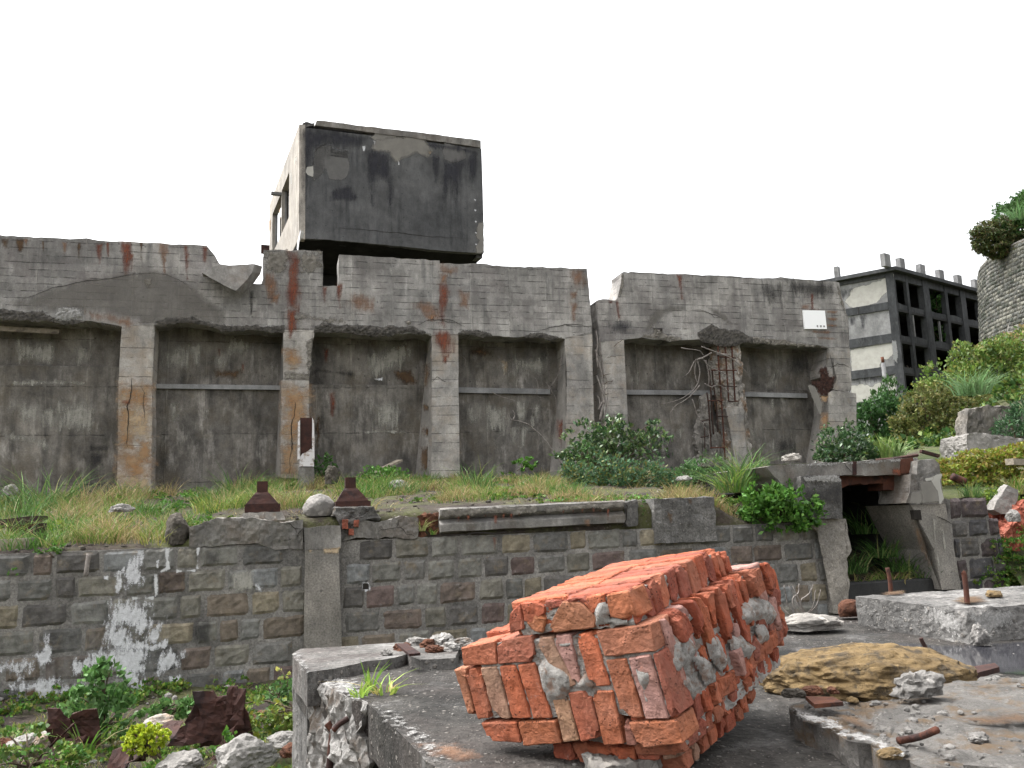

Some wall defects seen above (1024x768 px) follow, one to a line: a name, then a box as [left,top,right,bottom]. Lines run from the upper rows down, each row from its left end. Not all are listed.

damp [290,129,399,203]
damp [427,142,476,194]
rust [97,242,142,270]
peeling [0,273,284,333]
rust [266,254,300,334]
rust [420,270,452,319]
peeling [837,274,894,314]
rust [436,332,451,363]
peeling [850,340,898,371]
crack [126,380,145,447]
crack [288,402,296,473]
peeling [851,376,896,403]